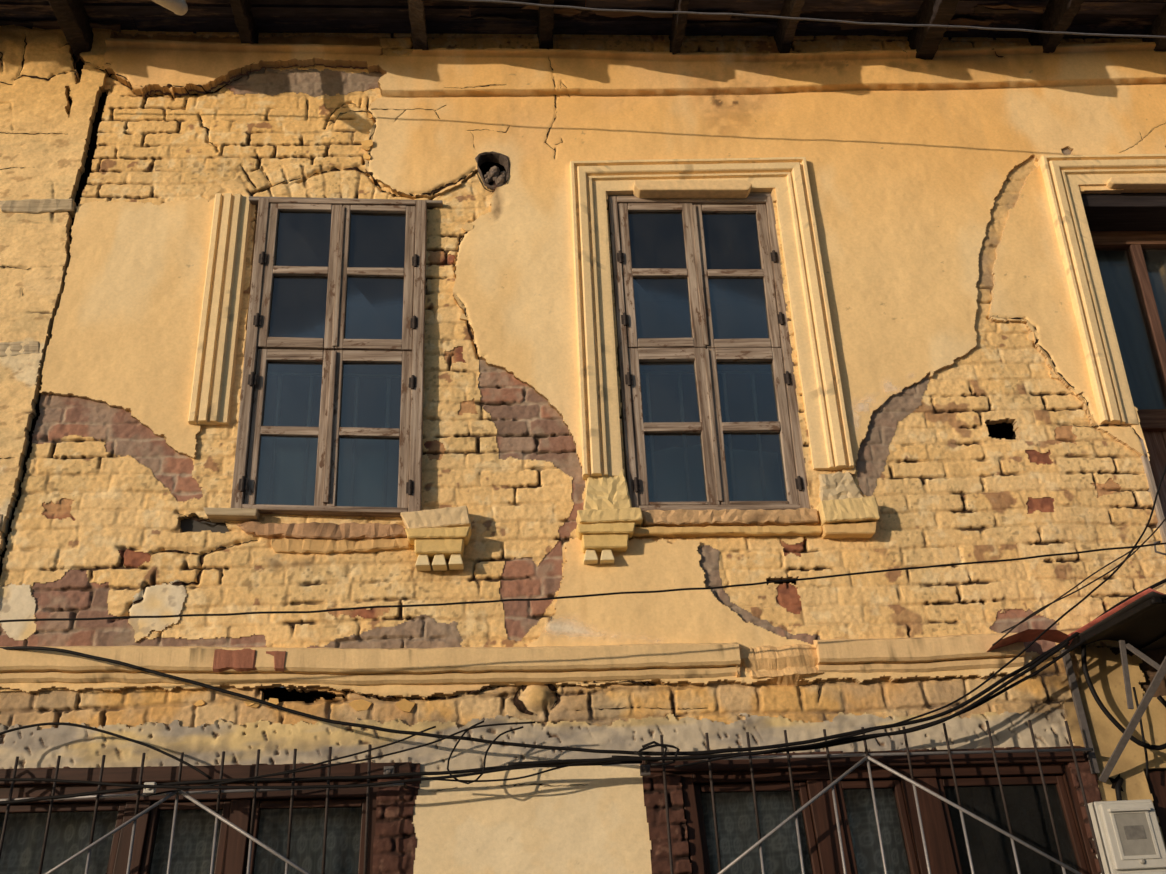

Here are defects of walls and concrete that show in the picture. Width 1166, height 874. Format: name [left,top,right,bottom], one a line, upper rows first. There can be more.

spalling [258,32,414,56]
spalling [427,33,539,50]
spalling [553,34,910,54]
spalling [938,37,1031,49]
crack [0,34,253,258]
crack [545,60,570,159]
spalling [0,65,587,672]
crack [0,376,42,578]
spalling [0,157,1166,730]